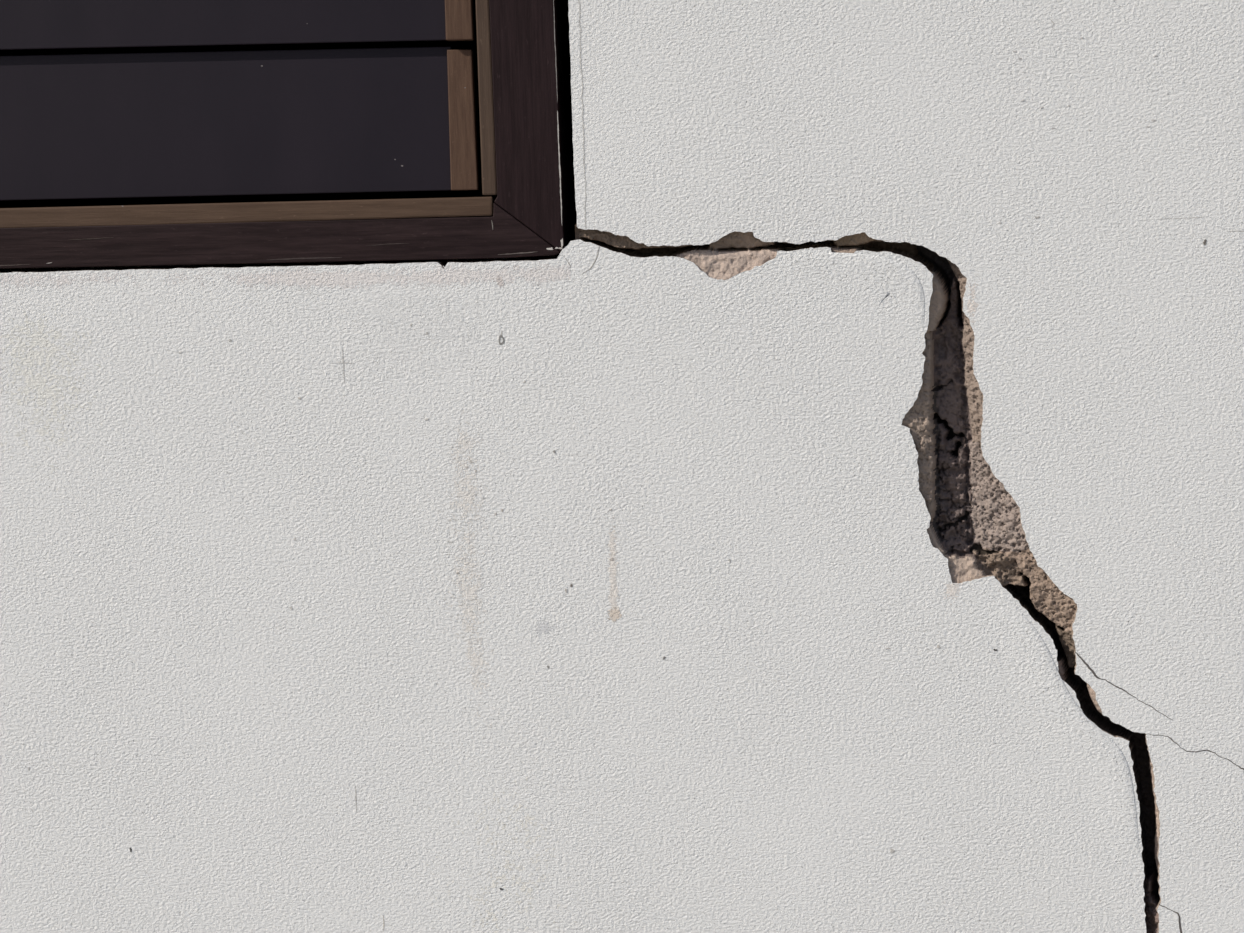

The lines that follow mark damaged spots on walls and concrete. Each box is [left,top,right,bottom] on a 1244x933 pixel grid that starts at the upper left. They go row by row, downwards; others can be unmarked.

peeling [677,231,784,280]
crack [566,0,1002,556]
spalling [901,260,1077,681]
spalling [1087,683,1102,714]
crack [1004,573,1244,933]